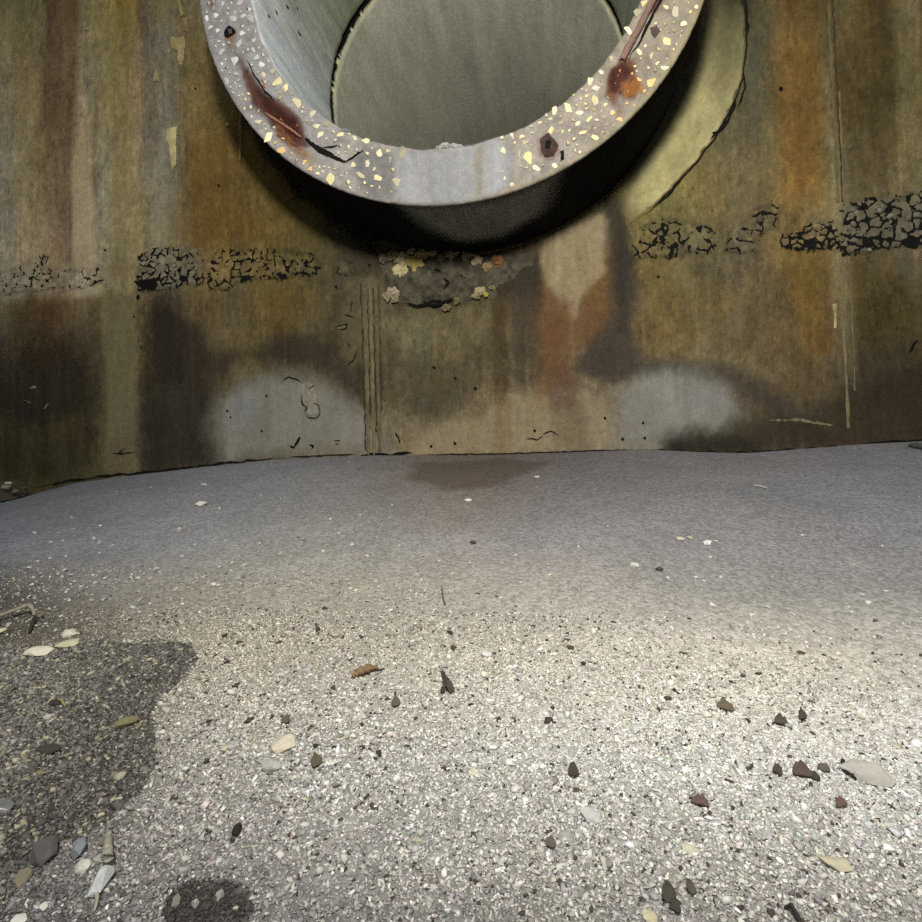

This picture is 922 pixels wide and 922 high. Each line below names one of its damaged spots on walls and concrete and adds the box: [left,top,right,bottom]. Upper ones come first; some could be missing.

rust [241,66,307,148]
rust [608,60,639,101]
crack [629,0,750,222]
leakage [249,125,622,312]
spalling [630,191,922,259]
spalling [0,254,104,296]
spalling [134,247,321,300]